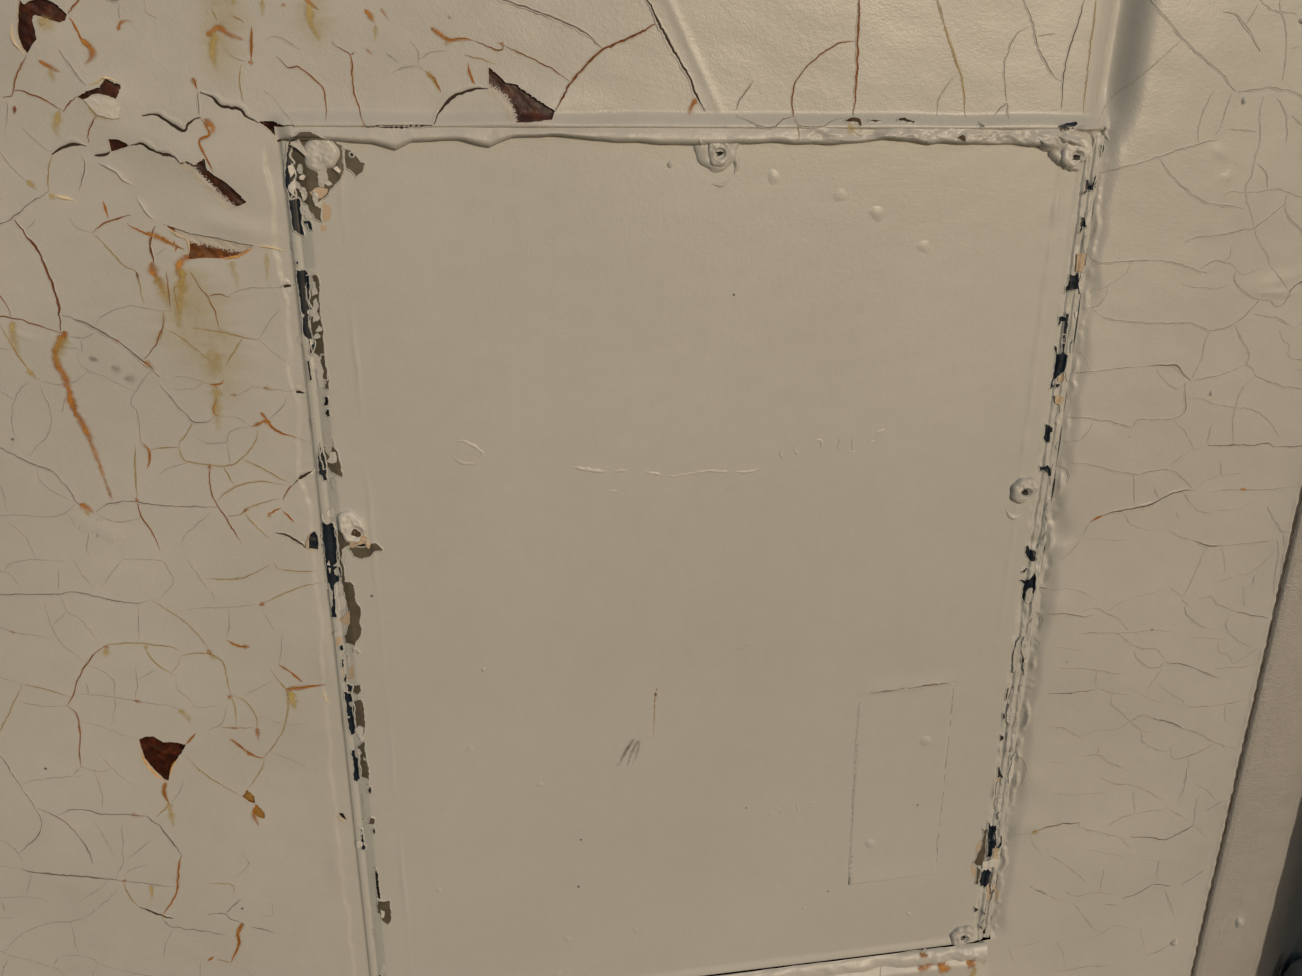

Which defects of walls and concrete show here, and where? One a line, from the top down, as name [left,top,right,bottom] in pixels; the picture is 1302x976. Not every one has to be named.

crack [224,26,365,126]
peeling [365,65,556,137]
crack [387,0,861,137]
peeling [0,0,366,492]
peeling [1064,143,1105,294]
peeling [1042,311,1078,444]
crack [0,125,330,976]
crack [936,0,1302,972]
peeling [305,508,384,851]
peeling [995,544,1044,796]
peeling [80,720,309,824]
peeling [971,821,1003,936]